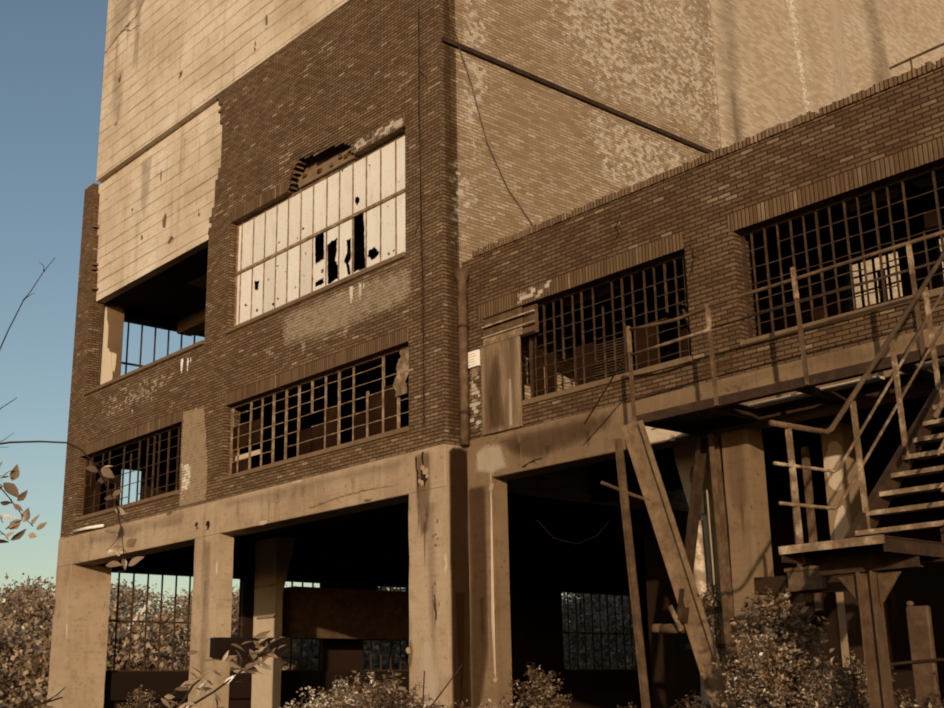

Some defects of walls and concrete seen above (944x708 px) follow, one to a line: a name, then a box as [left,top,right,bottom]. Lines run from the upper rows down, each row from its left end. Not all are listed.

crack [415,9,429,425]
crack [309,486,391,508]
crack [415,452,425,490]
water stain [423,642,435,708]